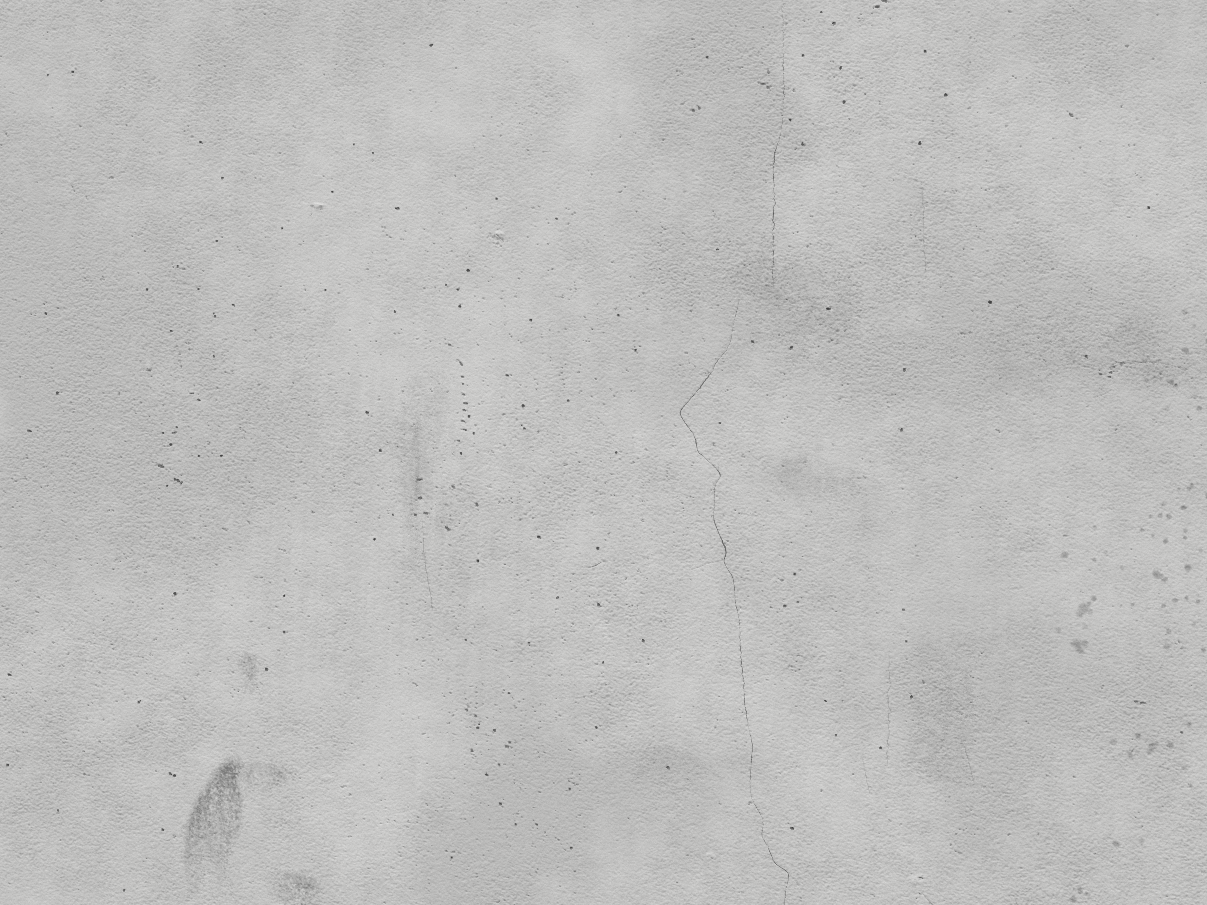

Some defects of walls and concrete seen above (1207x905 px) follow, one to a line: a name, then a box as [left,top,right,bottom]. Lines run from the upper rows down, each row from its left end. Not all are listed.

leakage [208,764,240,795]